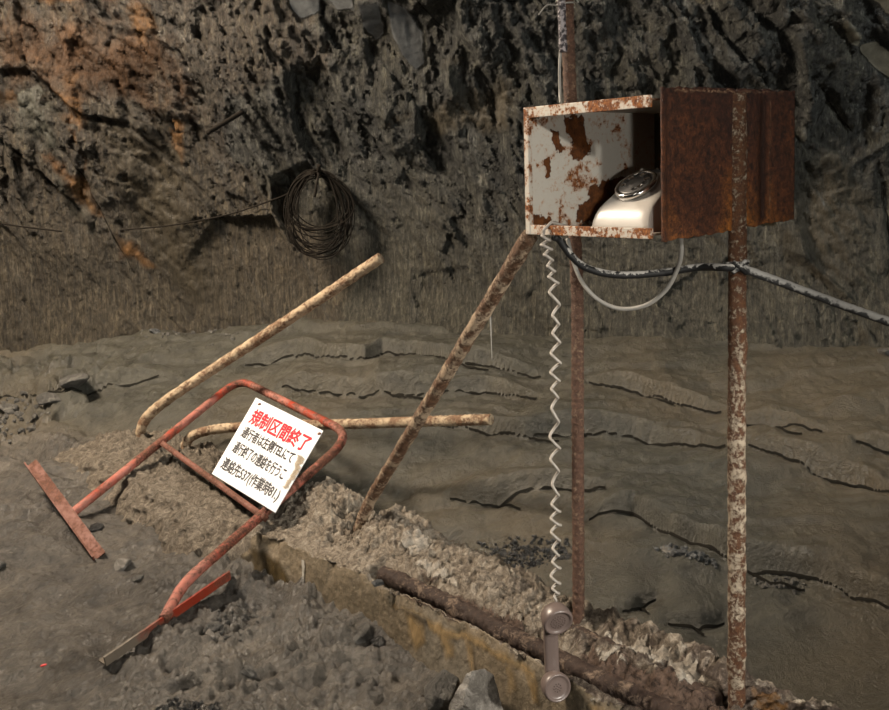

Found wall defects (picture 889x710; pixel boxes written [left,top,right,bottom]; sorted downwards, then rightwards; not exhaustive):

spalling [399,528,458,586]